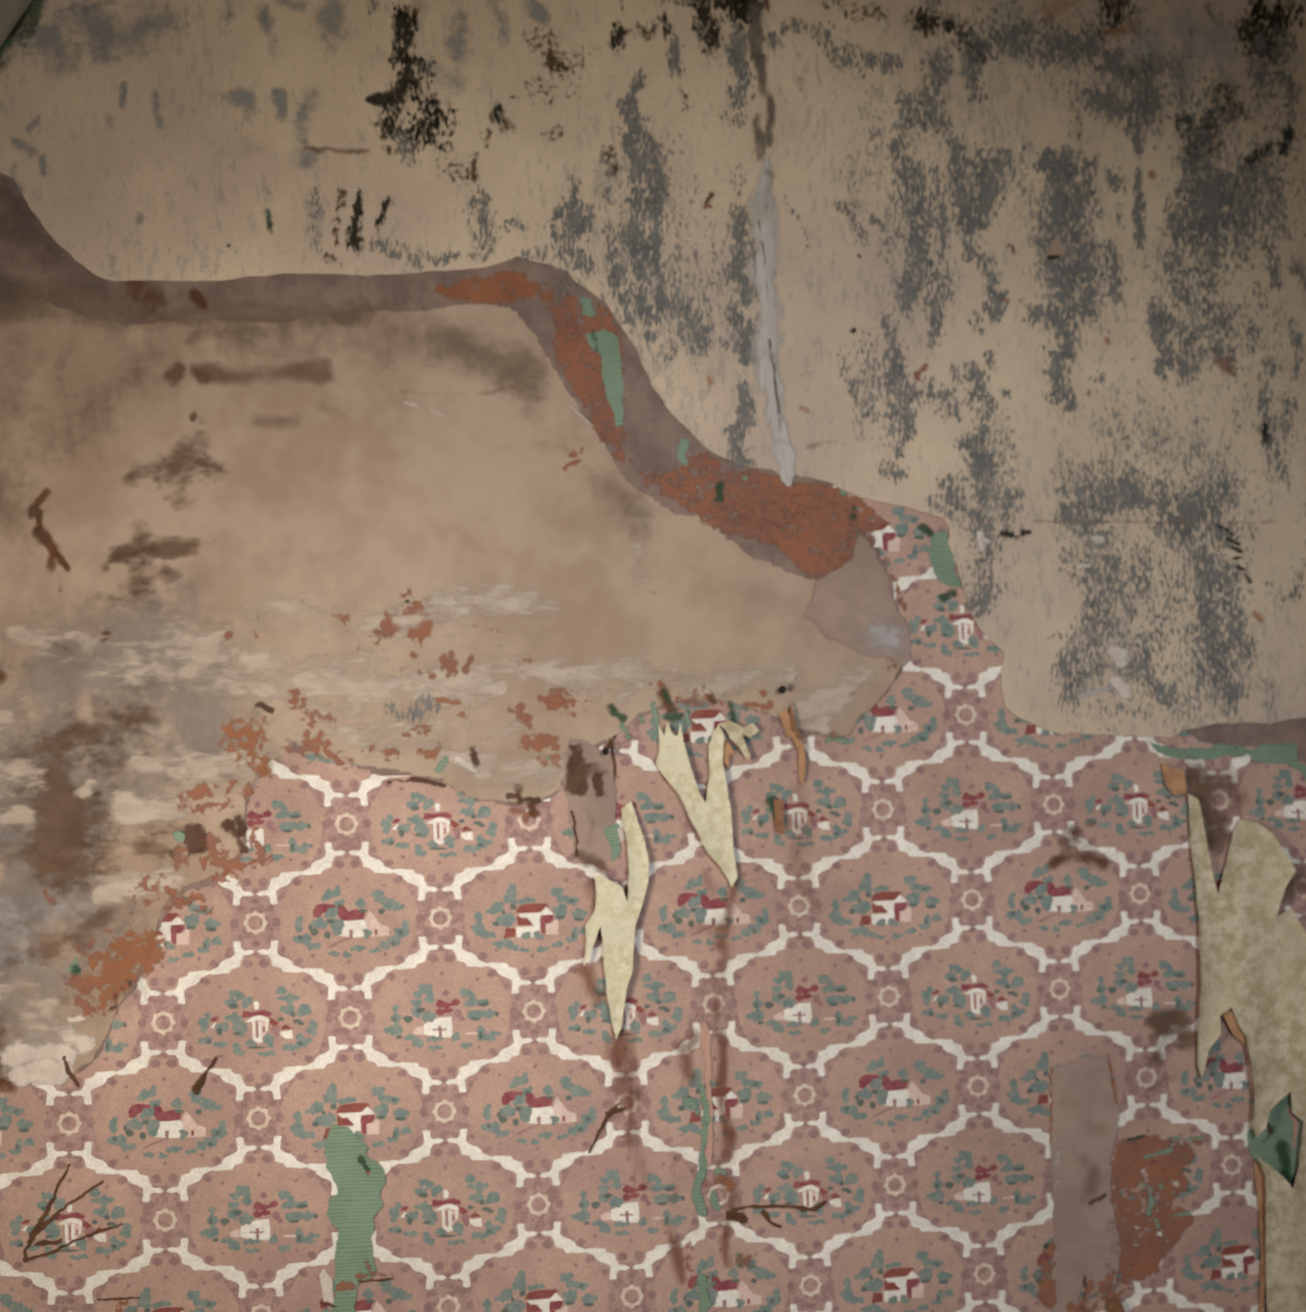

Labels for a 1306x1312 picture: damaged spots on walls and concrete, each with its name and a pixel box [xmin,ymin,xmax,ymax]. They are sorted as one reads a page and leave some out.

crack [744,0,795,486]
flaking render [0,173,900,613]
damp [524,0,1306,849]
damp [111,534,197,575]
peeling [929,530,962,587]
damp [285,588,587,787]
damp [0,609,247,1021]
damp [131,780,273,914]
peeling [67,873,225,1078]
peeling [319,1124,386,1312]
peeling [1079,1135,1203,1312]
peeling [1247,1093,1303,1183]